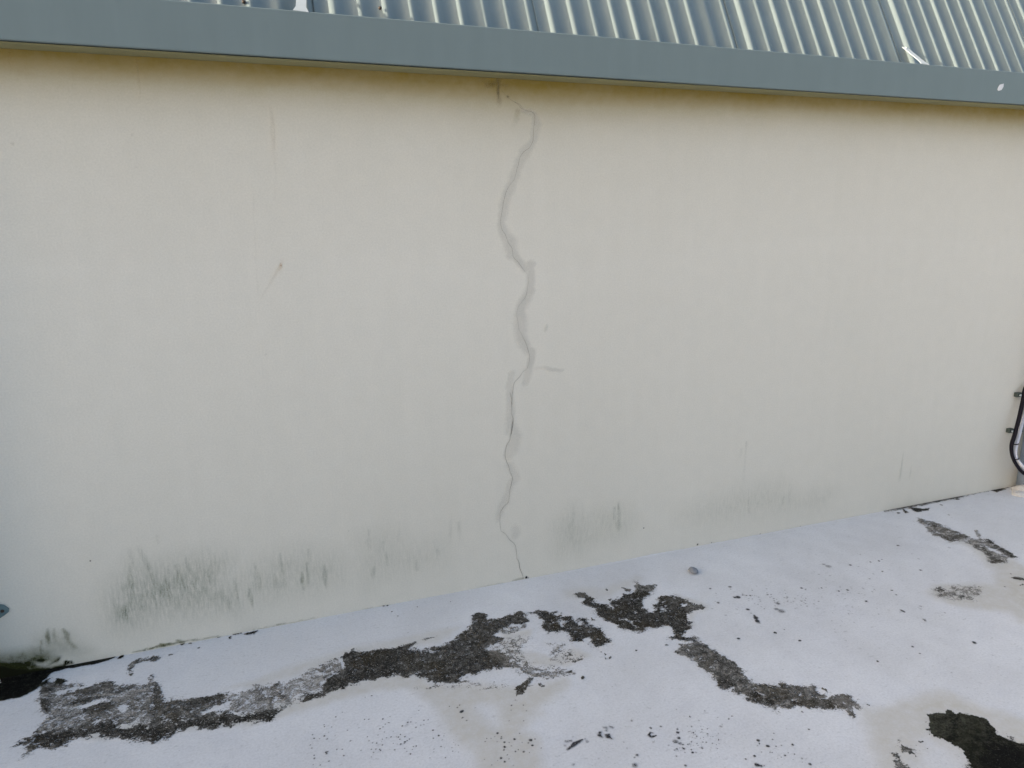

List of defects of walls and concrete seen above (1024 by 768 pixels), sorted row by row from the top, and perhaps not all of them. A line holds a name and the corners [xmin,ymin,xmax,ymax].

water stain [85,516,458,647]
peeling [885,486,1024,586]
peeling [936,585,982,601]
peeling [12,581,870,757]